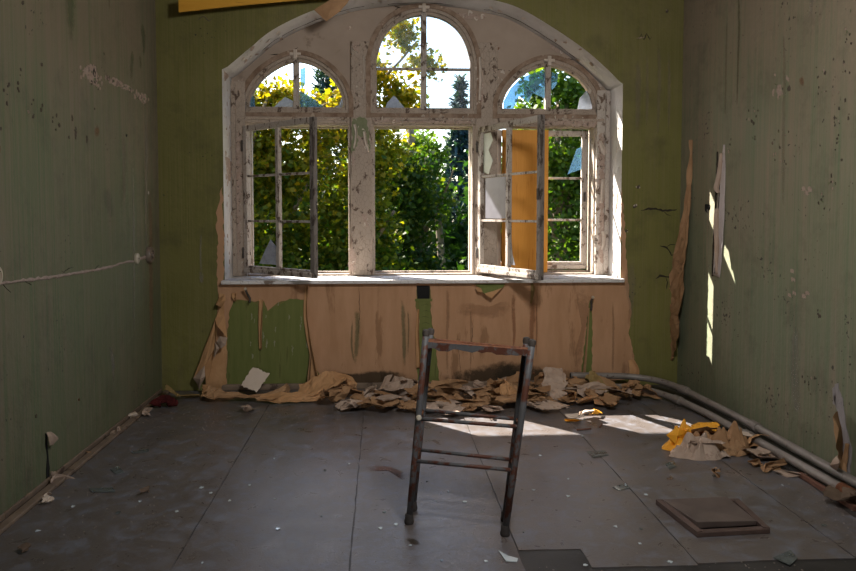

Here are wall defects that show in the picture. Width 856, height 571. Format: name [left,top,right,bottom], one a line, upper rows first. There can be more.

peeling [194,293,227,391]
peeling [288,285,318,381]
spalling [415,286,432,301]
peeling [474,284,505,298]
crack [641,208,677,216]
peeling [669,140,693,361]
peeling [705,139,731,278]